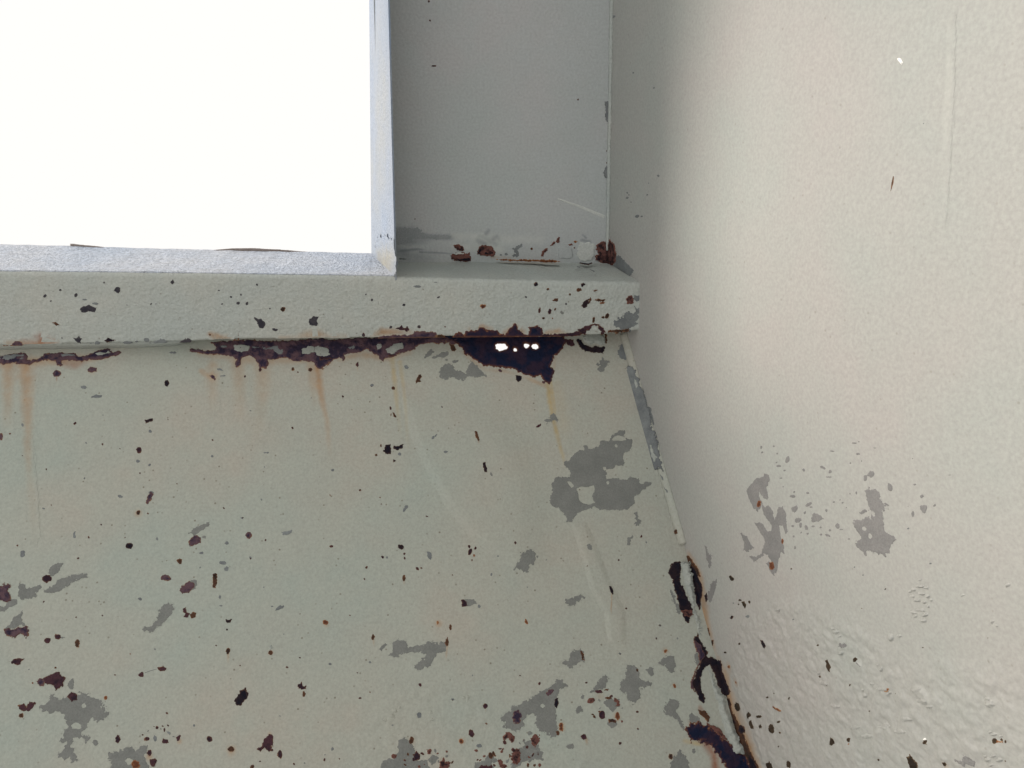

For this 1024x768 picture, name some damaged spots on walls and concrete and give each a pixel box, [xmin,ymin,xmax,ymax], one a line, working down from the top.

corrosion [451,227,512,262]
corrosion [595,239,617,265]
corrosion [0,322,119,545]
corrosion [179,282,609,471]
peeling [549,295,668,545]
peeling [740,441,896,576]
peeling [18,563,88,600]
peeling [38,678,157,768]
peeling [379,637,449,670]
peeling [498,648,585,749]
peeling [590,654,677,705]
corrosion [666,547,781,768]